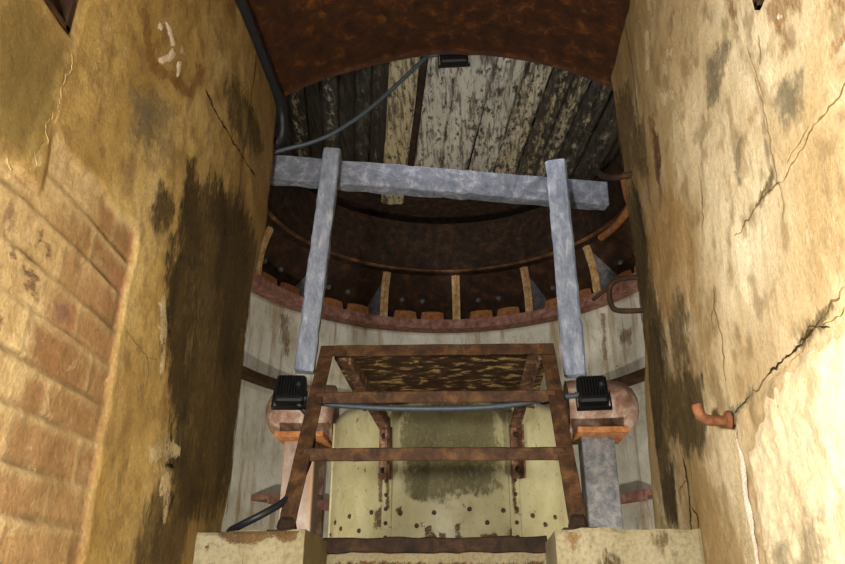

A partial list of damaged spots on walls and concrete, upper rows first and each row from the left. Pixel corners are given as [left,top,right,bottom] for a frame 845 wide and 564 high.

peeling [157,22,186,77]
crack [734,37,845,236]
water stain [132,155,257,564]
water stain [615,83,706,528]
crack [733,287,845,416]
water stain [729,390,759,564]